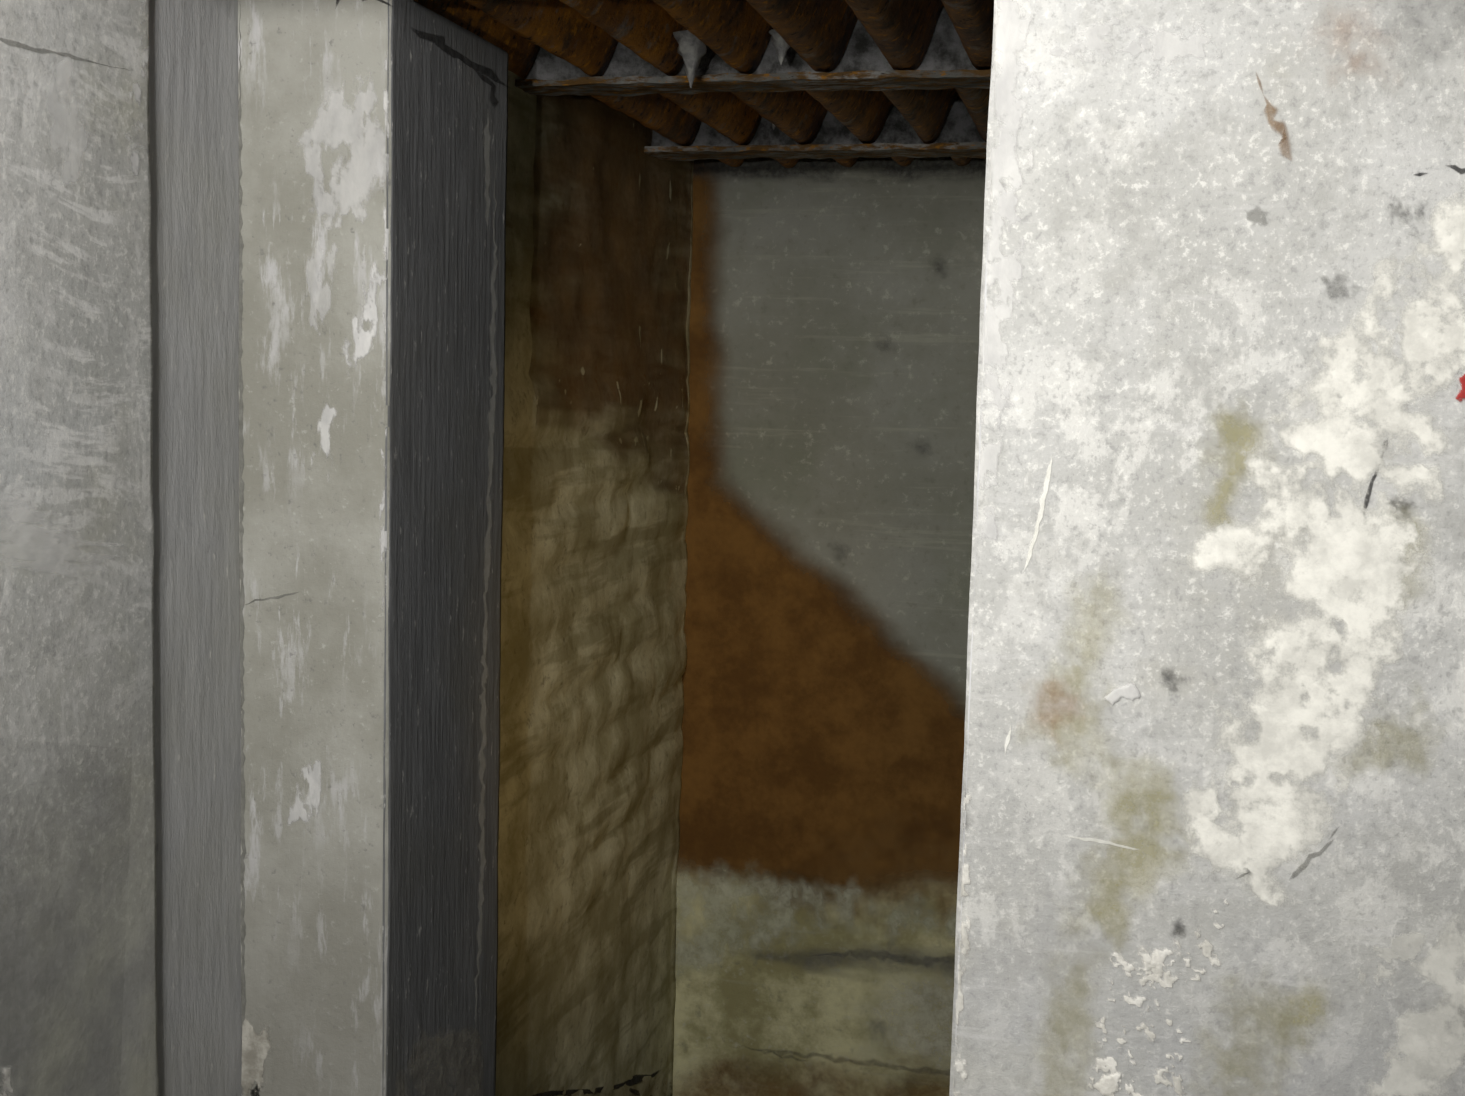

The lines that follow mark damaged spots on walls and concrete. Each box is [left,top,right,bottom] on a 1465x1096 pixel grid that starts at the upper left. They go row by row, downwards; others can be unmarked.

rust [530,95,965,892]
water stain [1212,416,1254,524]
water stain [1068,791,1169,871]
water stain [677,878,821,972]
water stain [890,898,956,935]